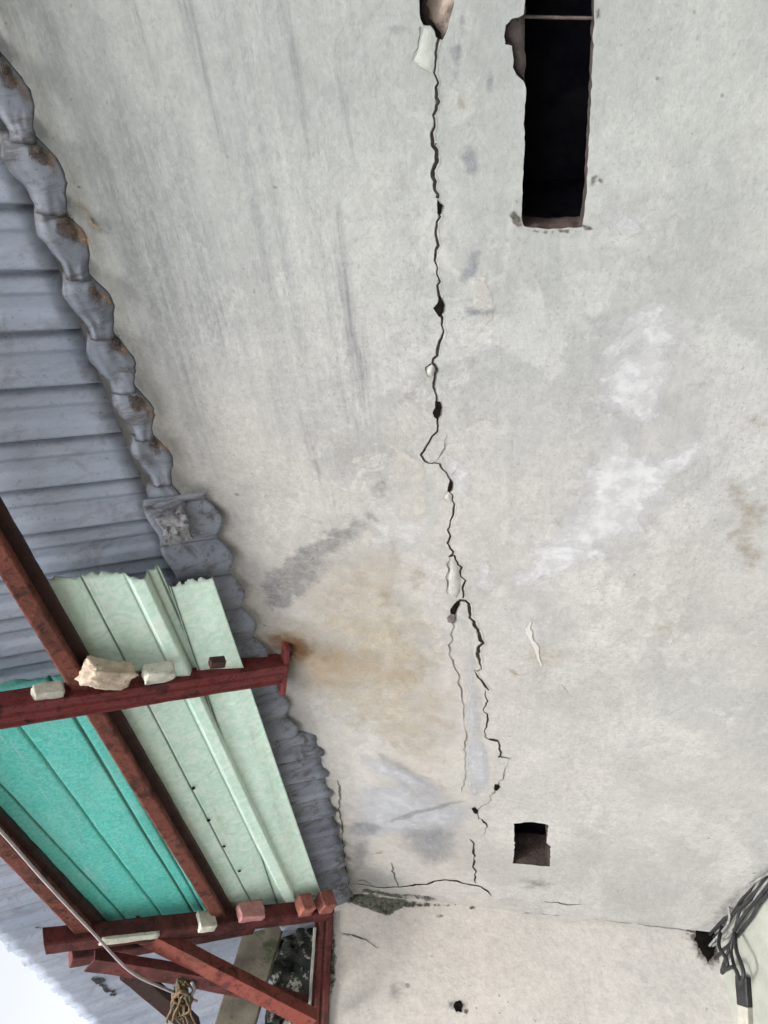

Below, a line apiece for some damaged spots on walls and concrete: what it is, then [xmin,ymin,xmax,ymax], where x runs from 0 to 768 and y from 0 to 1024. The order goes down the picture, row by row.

spalling [412,0,454,73]
spalling [505,0,602,234]
crack [337,37,509,894]
mould [347,889,449,915]